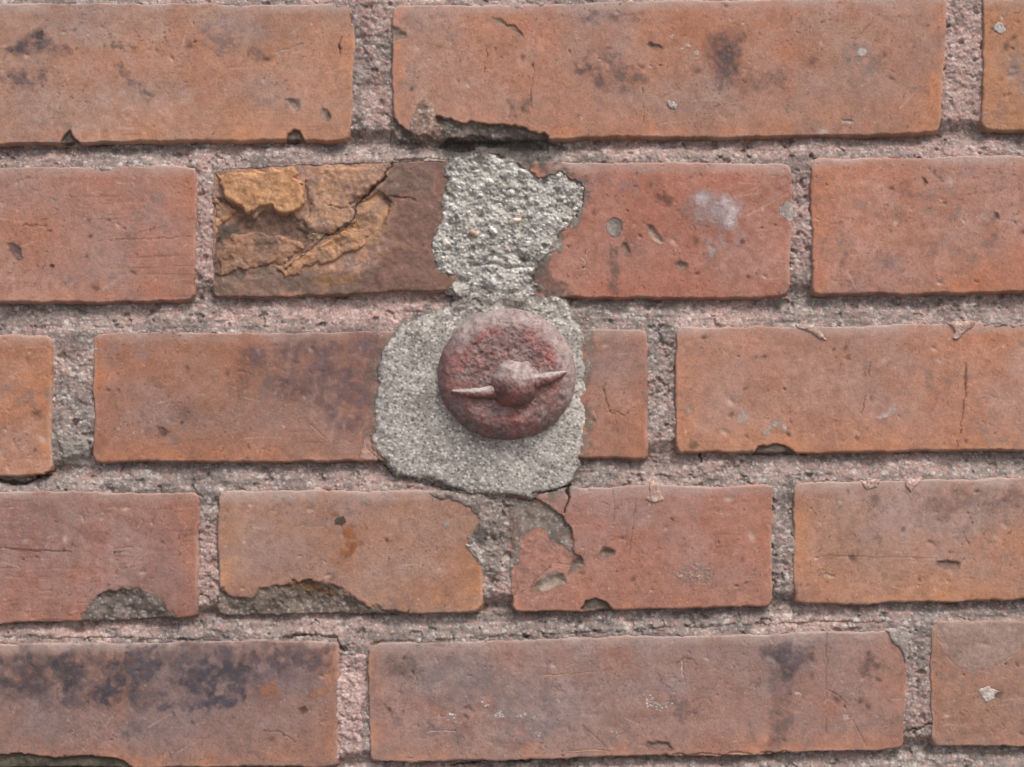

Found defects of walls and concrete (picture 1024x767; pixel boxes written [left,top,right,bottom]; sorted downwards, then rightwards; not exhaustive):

crack [288,157,449,268]
spalling [212,98,549,298]
spalling [81,587,176,621]
spalling [218,579,401,616]
peeling [465,542,486,565]
spalling [509,494,585,595]